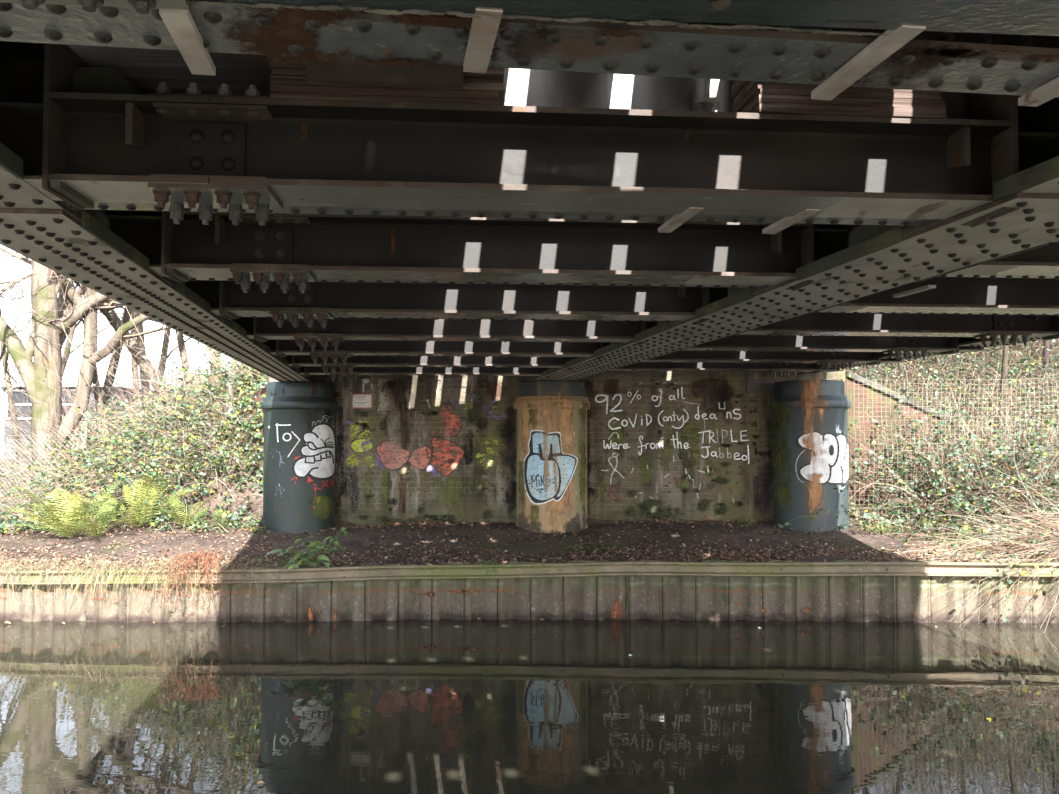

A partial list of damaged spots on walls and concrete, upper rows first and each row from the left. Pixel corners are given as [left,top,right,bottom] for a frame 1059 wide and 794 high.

corrosion [225,7,364,64]
corrosion [384,14,472,49]
damp [362,378,425,451]
damp [692,378,733,419]
corrosion [800,378,829,457]
damp [391,462,421,516]
corrosion [807,473,823,515]